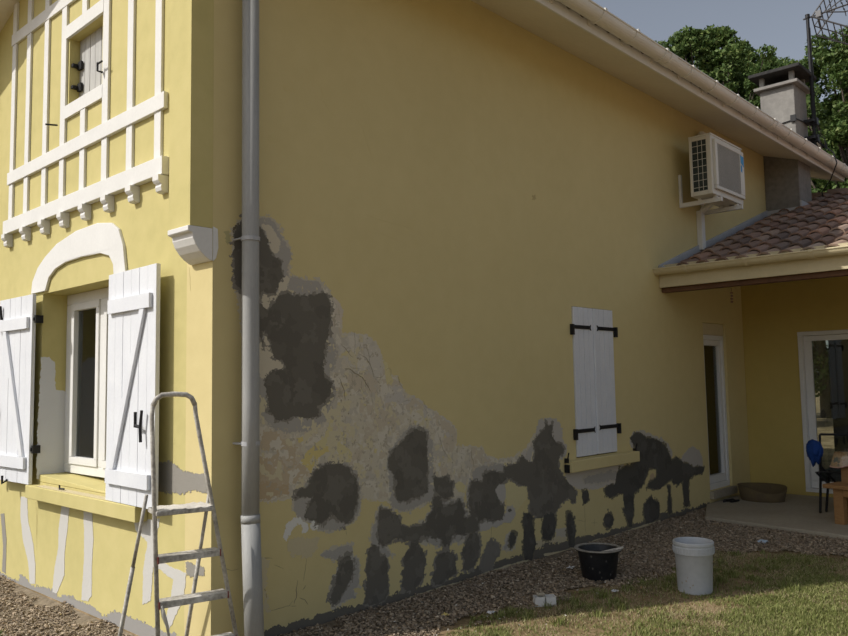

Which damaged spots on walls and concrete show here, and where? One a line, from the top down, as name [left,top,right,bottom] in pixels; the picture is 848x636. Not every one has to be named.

flaking render [261,224,281,253]
flaking render [259,275,290,309]
flaking render [259,336,284,379]
flaking render [682,446,703,467]